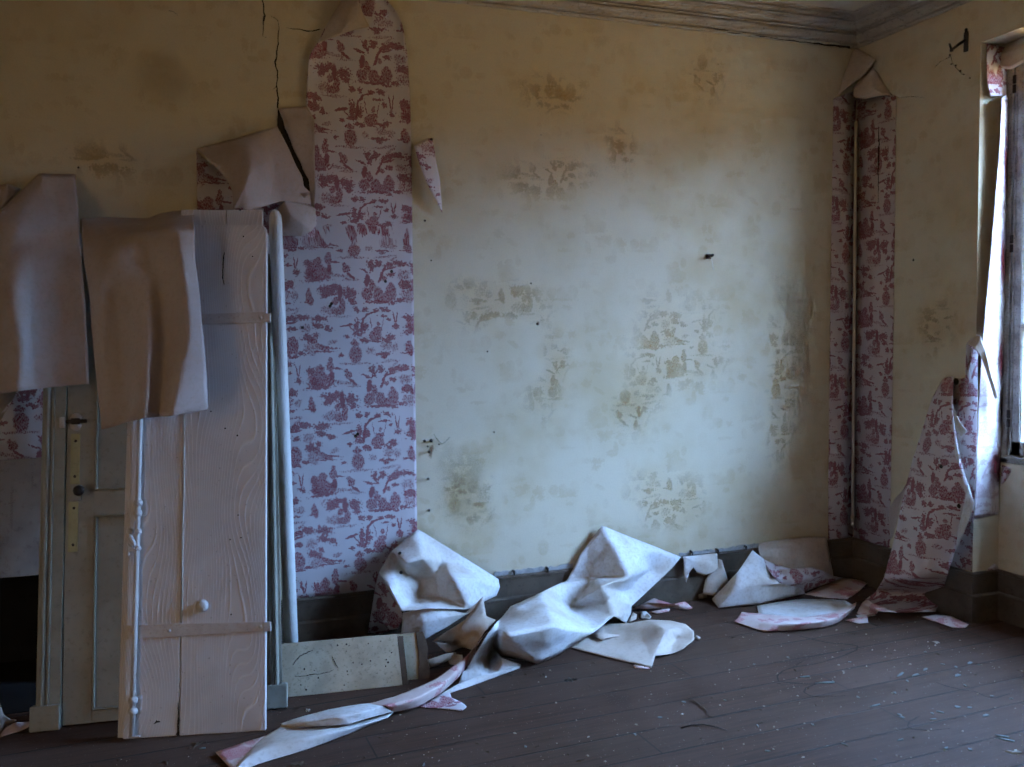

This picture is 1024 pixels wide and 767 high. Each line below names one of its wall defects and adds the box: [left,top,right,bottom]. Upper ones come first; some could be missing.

crack [262,0,320,192]